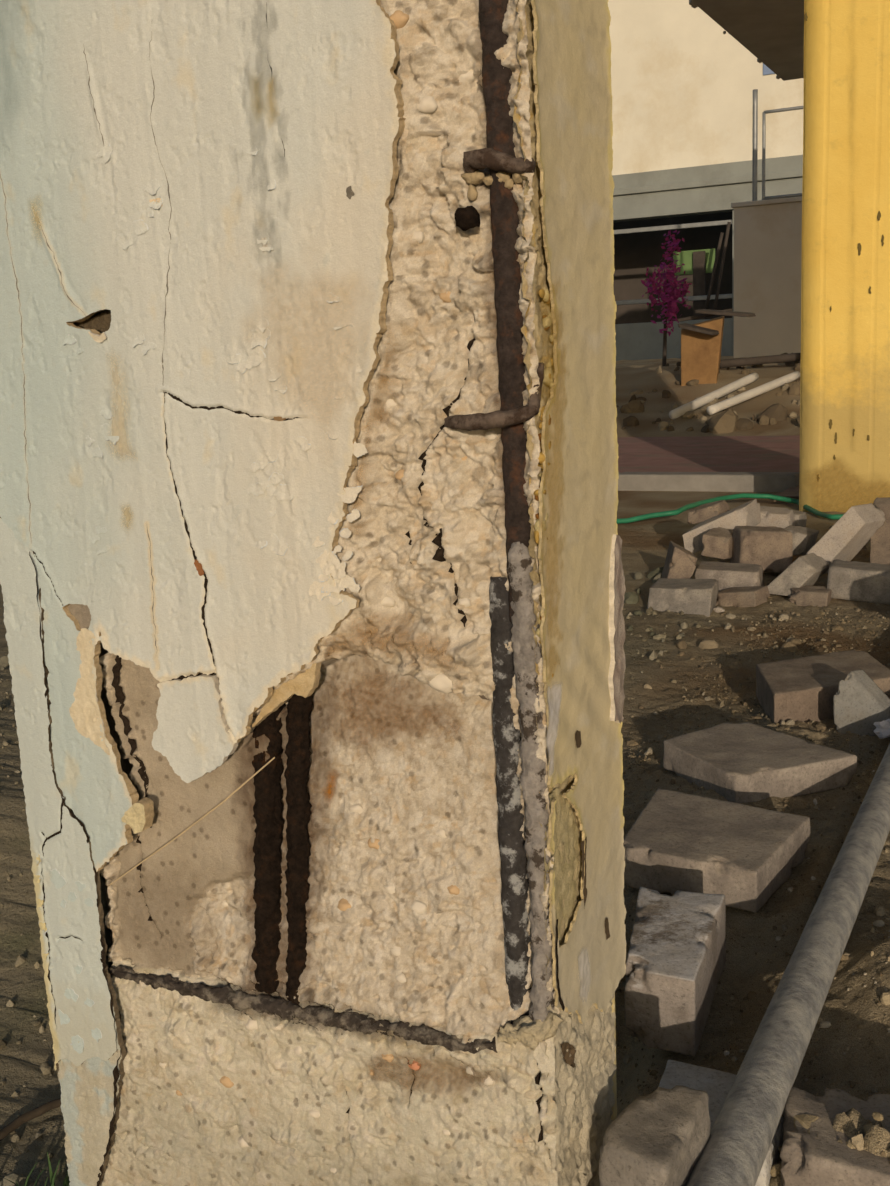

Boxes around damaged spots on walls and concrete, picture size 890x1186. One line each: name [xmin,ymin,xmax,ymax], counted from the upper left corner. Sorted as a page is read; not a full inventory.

crack [405,314,475,627]
spalling [58,0,587,1186]
flaking render [608,534,626,724]
crack [111,655,149,797]
peeling [36,898,48,934]
crack [136,826,153,921]